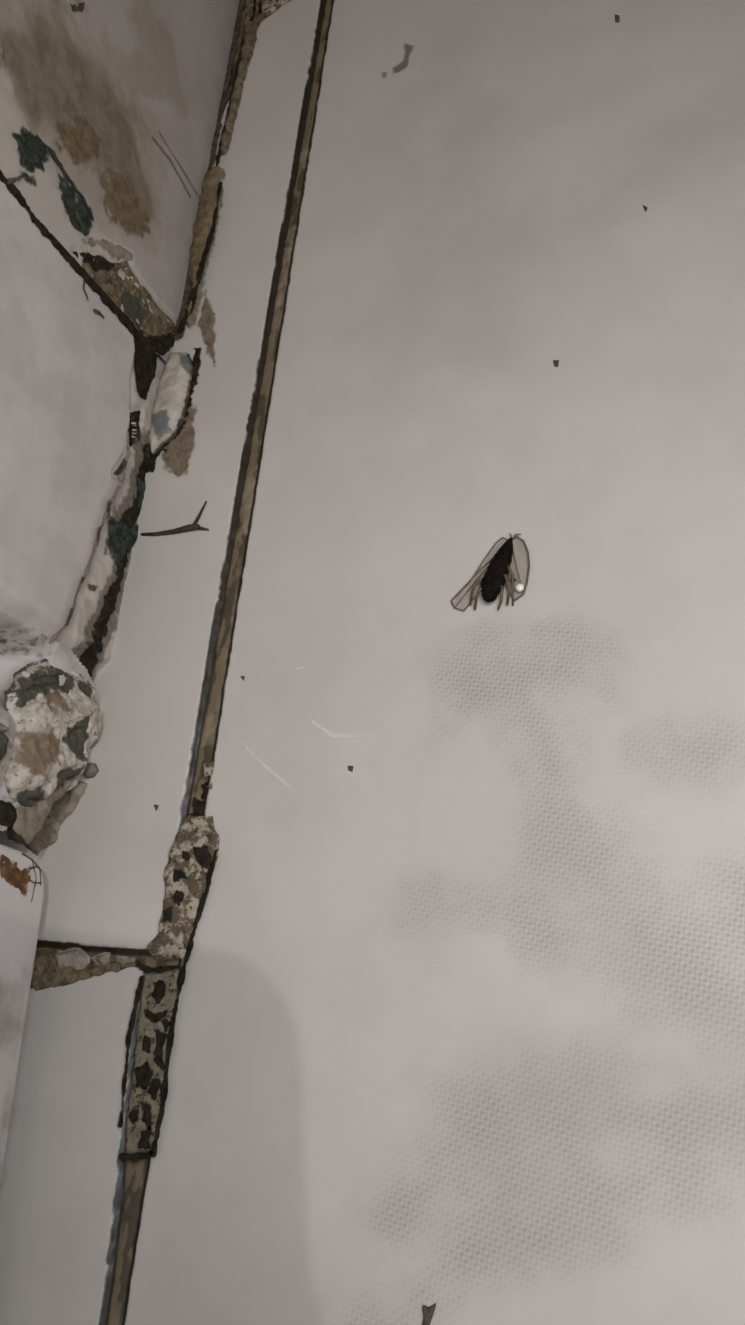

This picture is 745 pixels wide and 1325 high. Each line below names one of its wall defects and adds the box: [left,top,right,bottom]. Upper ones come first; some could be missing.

water stain [3,21,150,238]
crack [0,170,201,680]
flaking render [73,237,176,341]
flaking render [0,447,131,844]